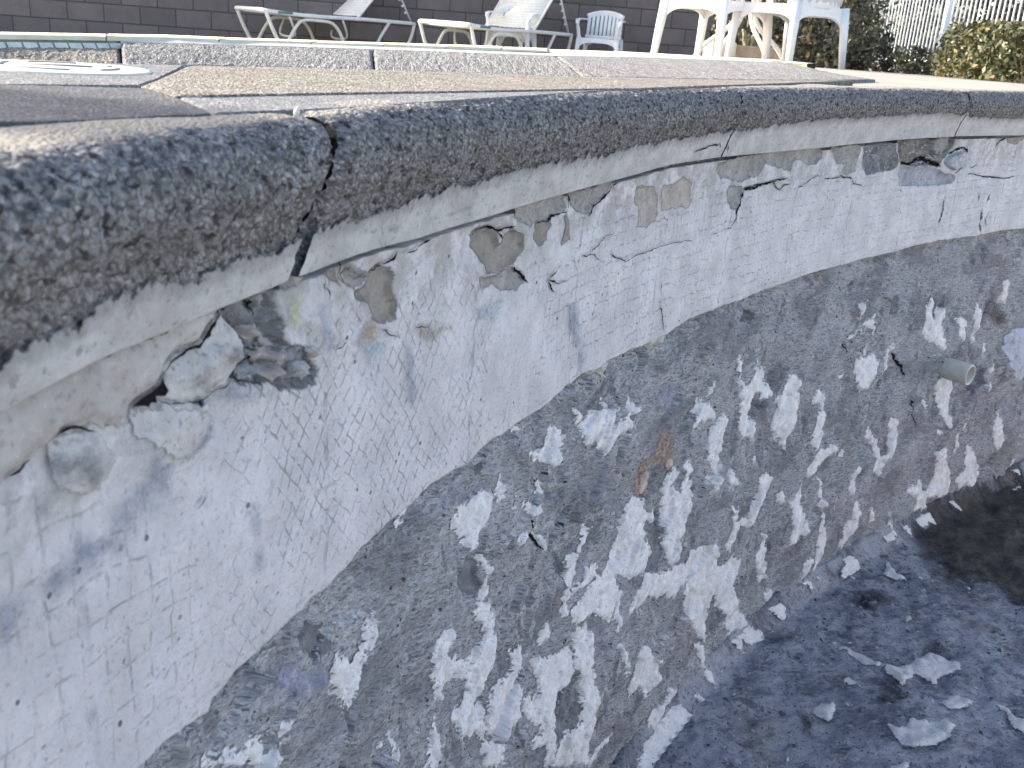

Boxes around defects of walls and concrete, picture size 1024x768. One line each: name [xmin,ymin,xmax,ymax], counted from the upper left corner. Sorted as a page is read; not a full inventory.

crack [369,239,431,272]
crack [472,182,617,238]
crack [511,174,861,292]
spalling [716,137,955,210]
crack [900,147,1013,232]
spalling [217,276,318,391]
peeling [838,299,895,393]
peeling [921,296,987,354]
peeling [423,349,980,768]
leakage [914,466,1024,605]
peeling [297,610,379,713]
peeling [201,718,294,768]